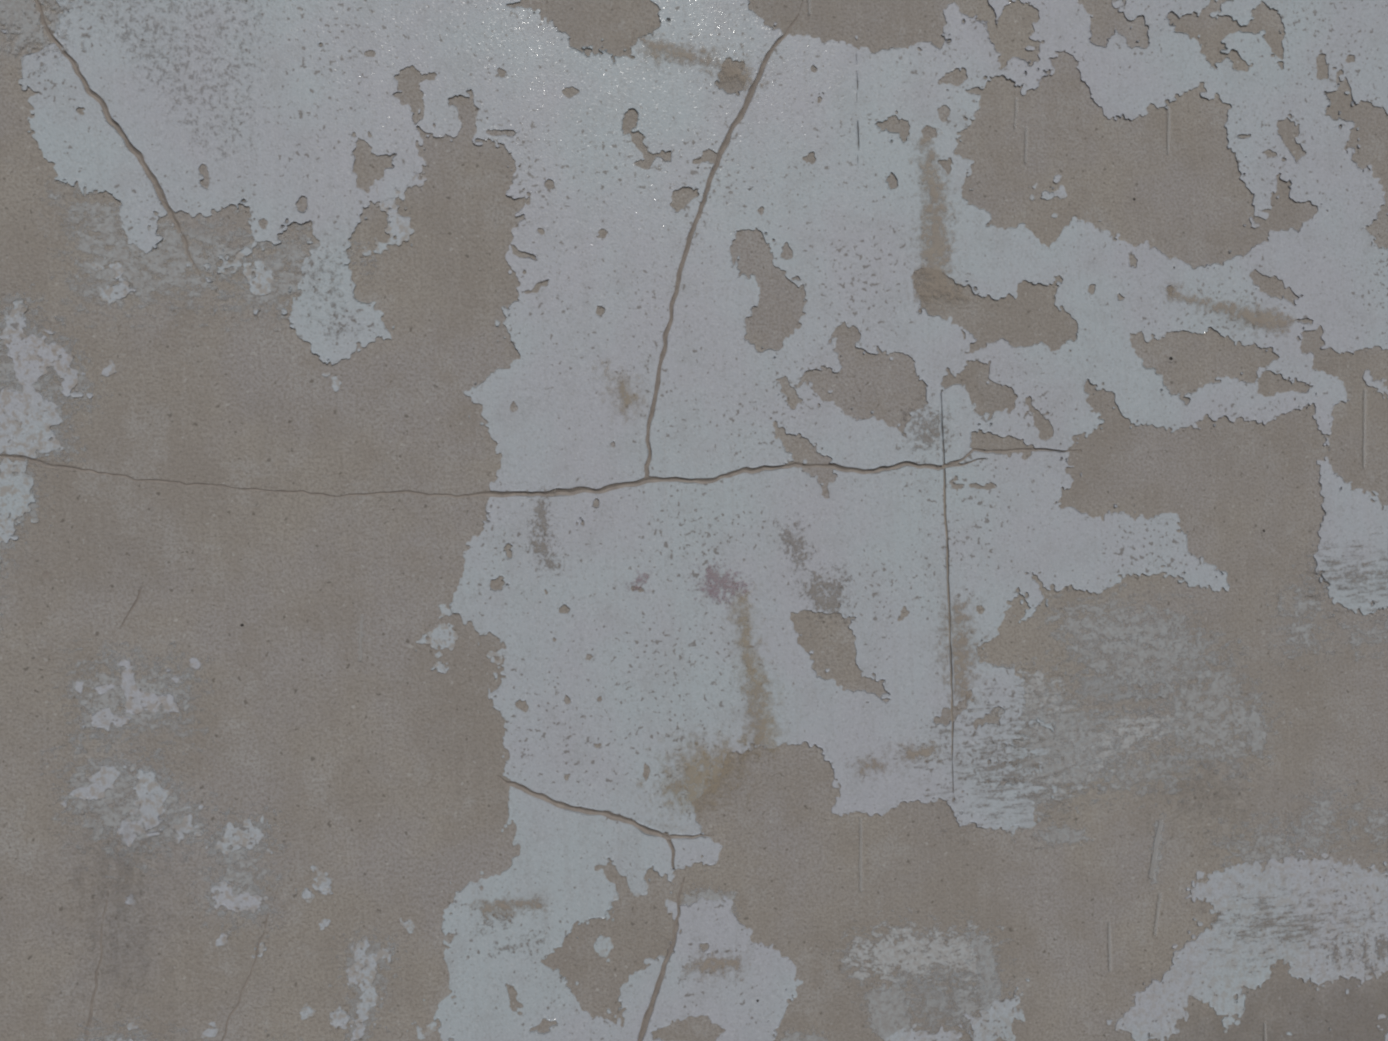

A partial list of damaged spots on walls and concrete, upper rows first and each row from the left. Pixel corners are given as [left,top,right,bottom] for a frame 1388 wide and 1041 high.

peeling [0,0,554,1041]
crack [0,0,1081,778]
crack [498,775,714,1041]
peeling [481,0,1388,1041]